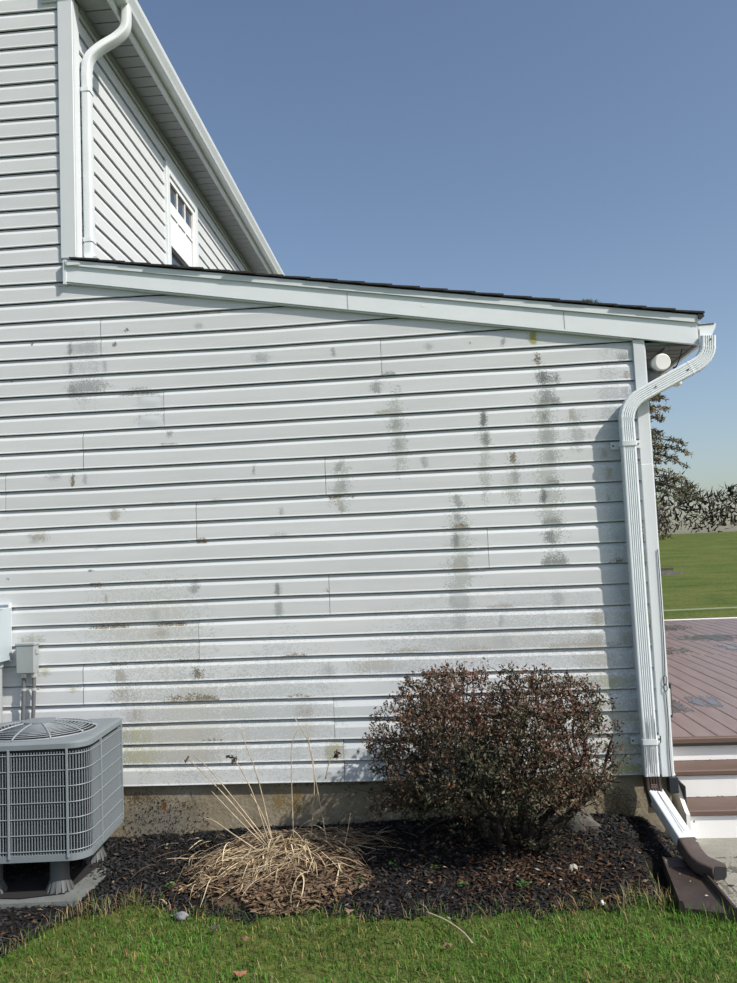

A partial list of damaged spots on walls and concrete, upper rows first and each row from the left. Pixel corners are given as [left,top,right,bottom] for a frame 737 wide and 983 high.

water stain [65,340,177,446]
water stain [328,457,358,513]
water stain [368,370,429,480]
water stain [474,361,595,565]
water stain [439,492,482,633]